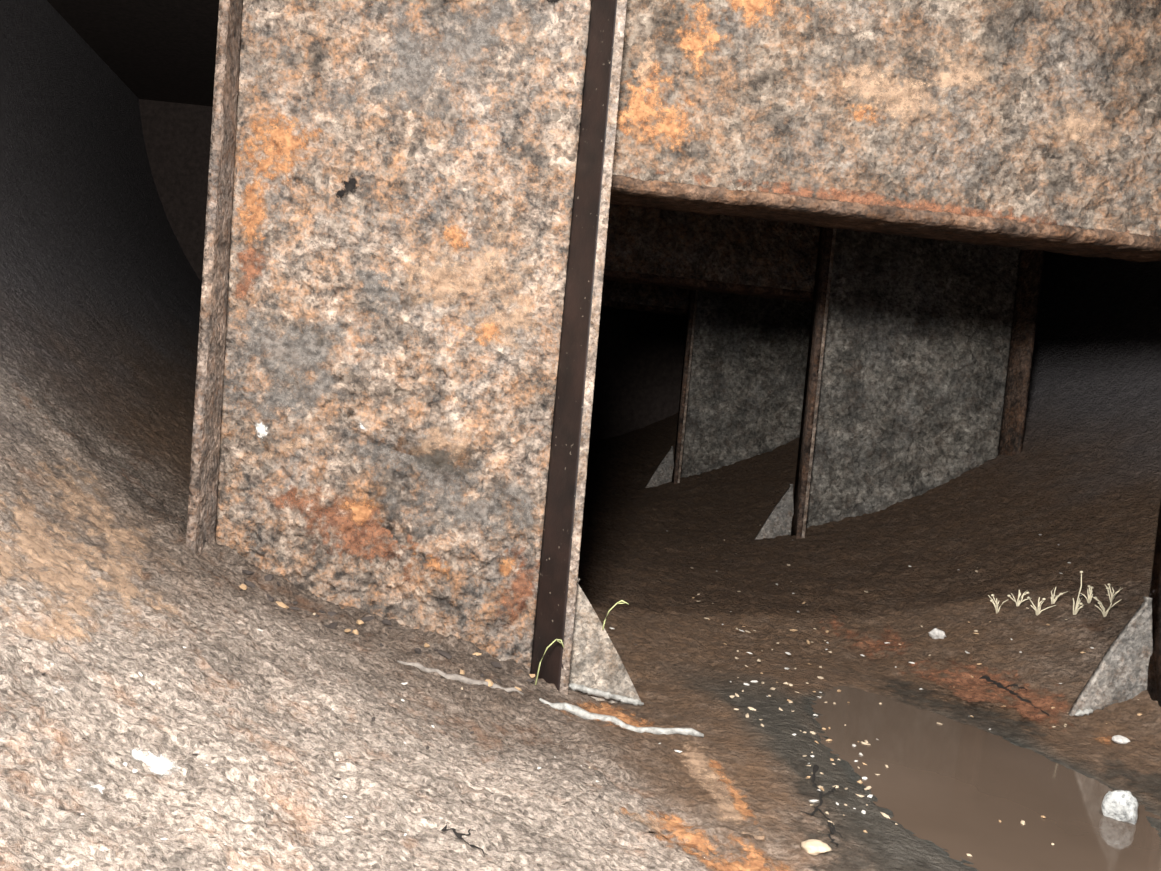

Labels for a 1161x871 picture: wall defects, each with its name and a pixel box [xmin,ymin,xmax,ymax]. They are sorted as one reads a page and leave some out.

rust [677,2,730,78]
rust [731,0,780,27]
rust [617,41,704,154]
rust [236,112,322,298]
rust [272,485,450,582]